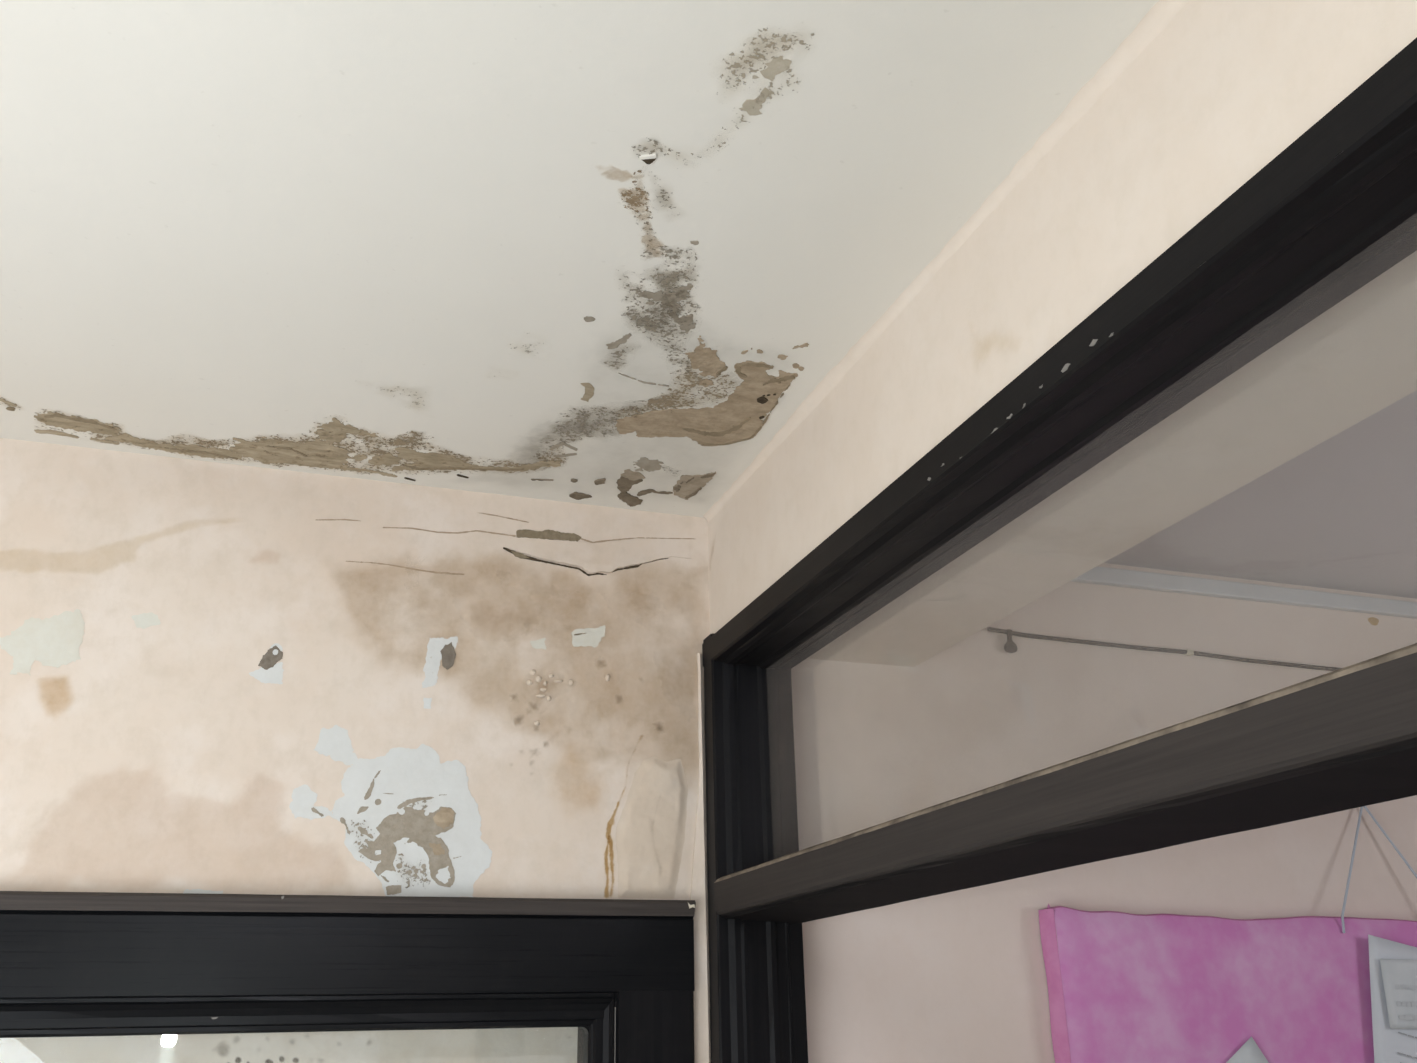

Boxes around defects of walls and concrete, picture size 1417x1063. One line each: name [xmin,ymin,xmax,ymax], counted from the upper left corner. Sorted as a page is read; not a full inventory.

peeling [667,22,814,165]
peeling [604,266,809,446]
crack [0,397,20,411]
peeling [580,383,594,402]
peeling [34,409,566,481]
flaking render [569,457,716,507]
crack [316,513,694,543]
crack [346,561,464,575]
peeling [571,625,606,648]
flaking render [249,643,284,684]
flaking render [422,636,458,709]
peeling [289,725,492,897]